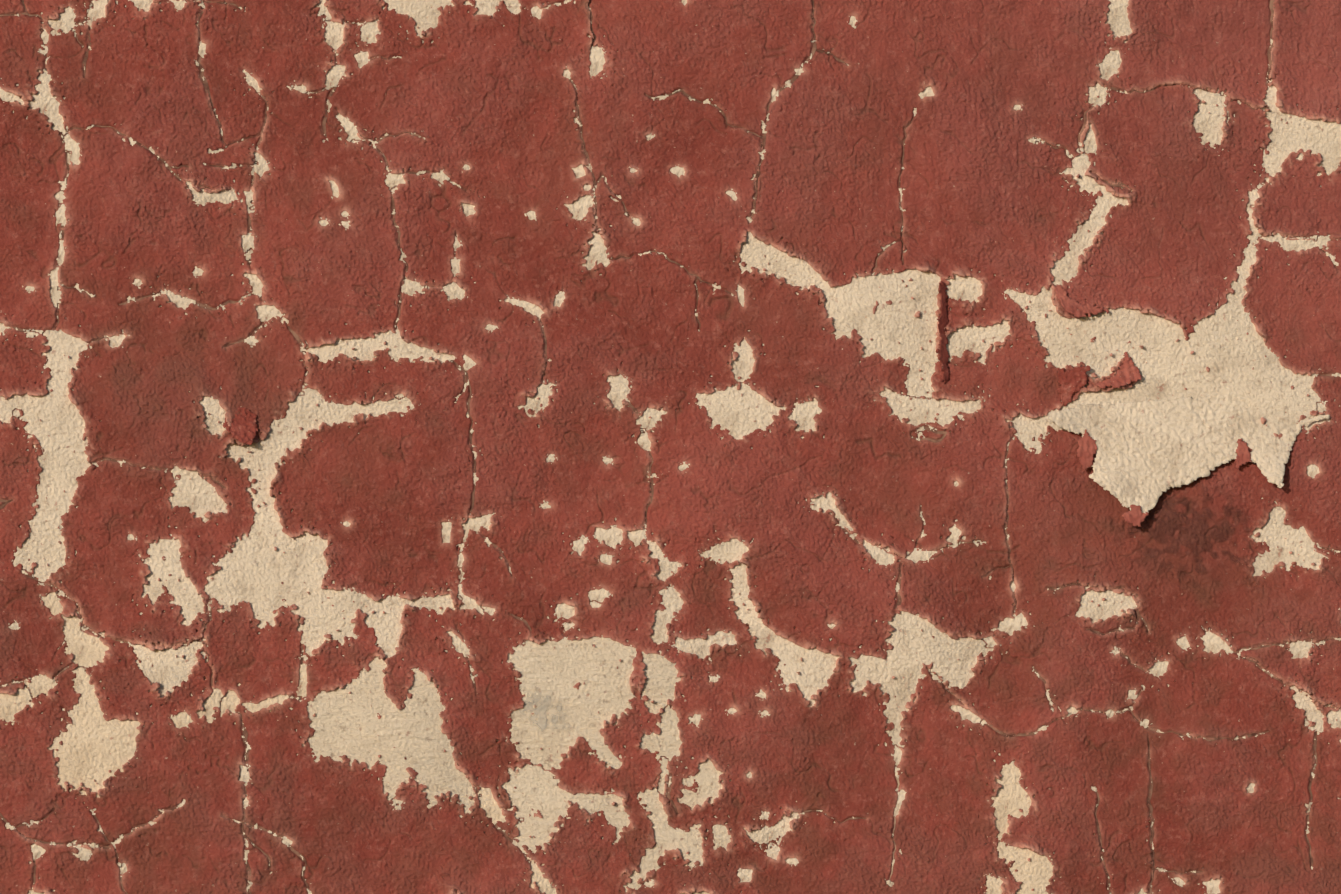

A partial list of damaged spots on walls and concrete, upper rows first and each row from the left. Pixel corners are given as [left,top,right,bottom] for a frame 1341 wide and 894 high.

crack [0,0,735,428]
peeling [382,0,543,43]
crack [645,0,849,223]
peeling [1085,0,1132,114]
peeling [733,72,1341,585]
crack [441,355,536,690]
peeling [0,317,1043,894]
crack [594,371,677,540]
crack [836,438,1341,894]
crack [0,799,186,894]
crack [222,712,312,894]
peeling [979,750,1061,894]